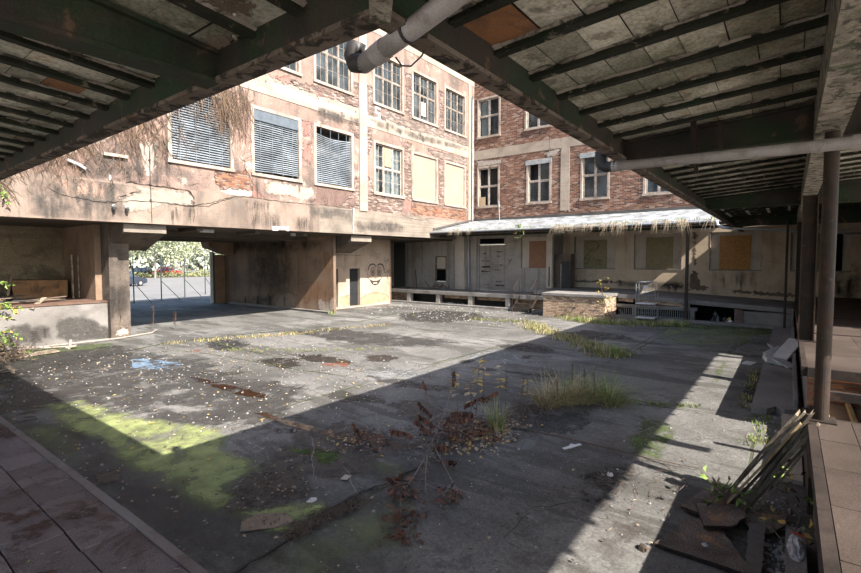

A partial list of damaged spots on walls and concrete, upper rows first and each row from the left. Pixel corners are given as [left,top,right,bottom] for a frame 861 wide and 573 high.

crack [46,135,351,220]
flaking render [214,158,317,202]
flaking render [663,232,708,291]